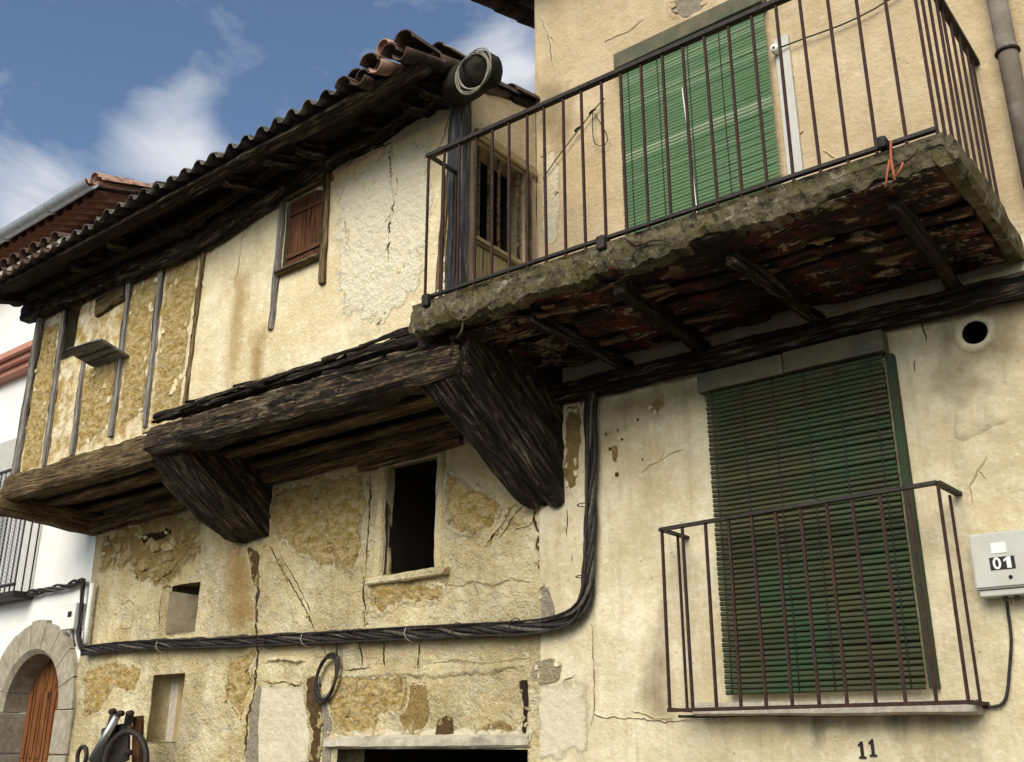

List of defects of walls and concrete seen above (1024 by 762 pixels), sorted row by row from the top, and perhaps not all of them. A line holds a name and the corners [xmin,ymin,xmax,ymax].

flaking render [666,0,710,23]
crack [345,142,398,262]
flaking render [316,137,448,325]
flaking render [22,324,59,471]
flaking render [78,256,198,445]
flaking render [562,400,585,496]
flaking render [99,514,201,588]
crack [441,503,539,597]
crack [565,508,573,562]
crack [240,473,422,762]
flaking render [303,665,541,762]